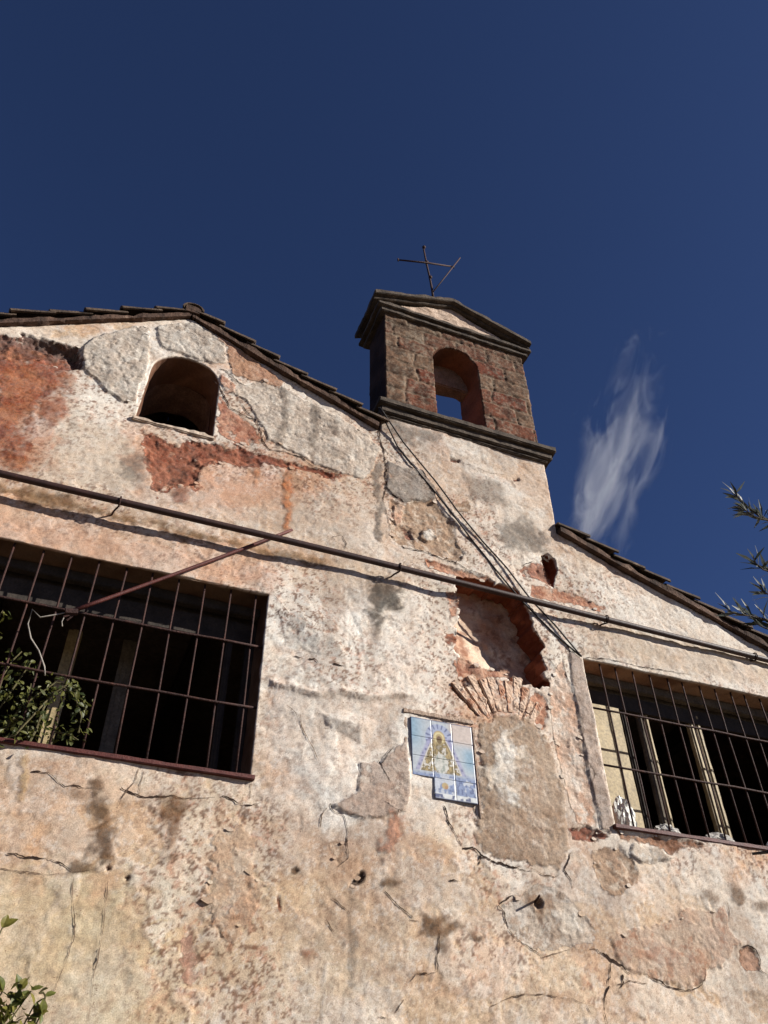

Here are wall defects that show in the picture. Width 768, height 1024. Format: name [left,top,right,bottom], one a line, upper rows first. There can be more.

peeling [0,322,489,582]
crack [213,369,342,473]
spalling [445,591,460,616]
spalling [454,657,509,682]
leakage [72,778,115,872]
crack [31,769,259,806]
peeling [338,742,411,852]
peeling [474,652,704,896]
crack [0,853,108,1000]
crack [492,895,706,1023]
peeling [613,907,760,992]